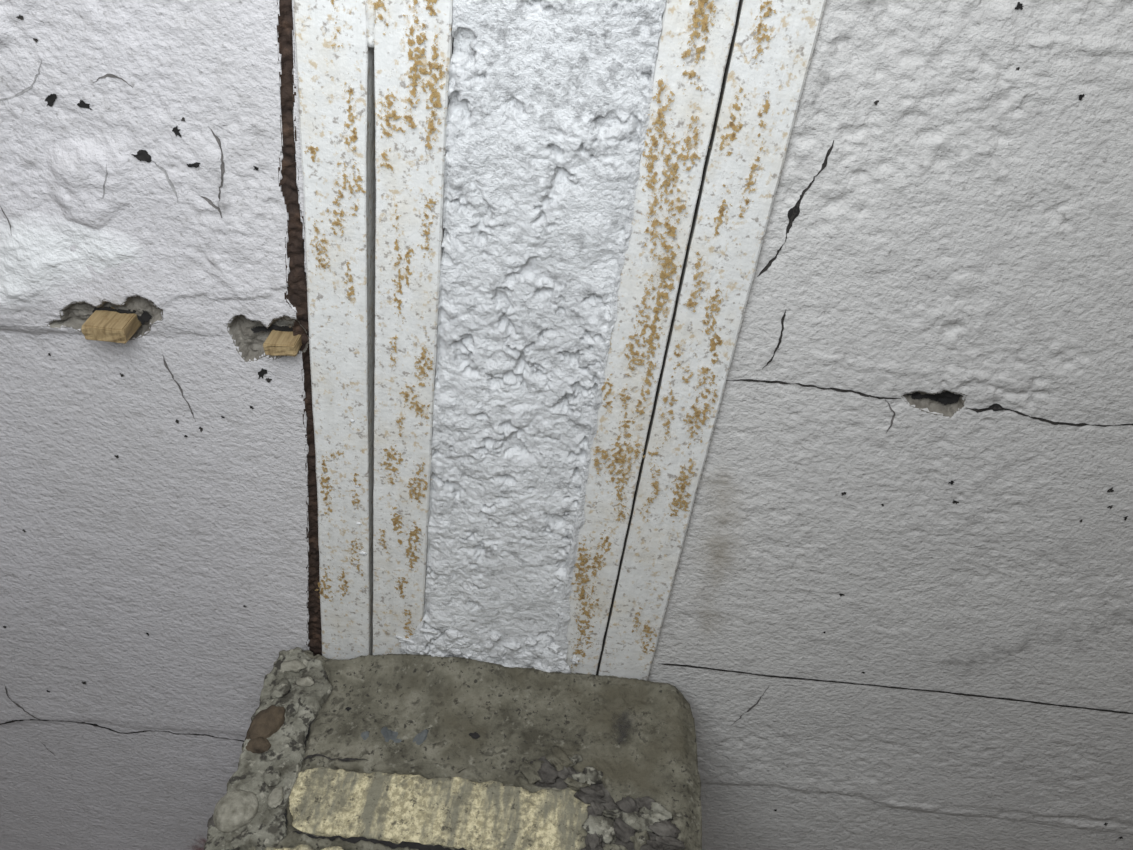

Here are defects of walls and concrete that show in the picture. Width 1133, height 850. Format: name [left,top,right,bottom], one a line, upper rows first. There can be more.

corrosion [376,0,448,173]
crack [757,140,834,277]
flaking render [47,295,163,340]
flaking render [227,315,309,383]
corrosion [276,0,425,656]
corrosion [381,346,433,505]
corrosion [571,0,746,671]
crack [727,310,899,433]
flaking render [901,391,967,418]
crack [663,664,1133,724]
crack [284,809,466,850]
spalling [519,745,686,850]